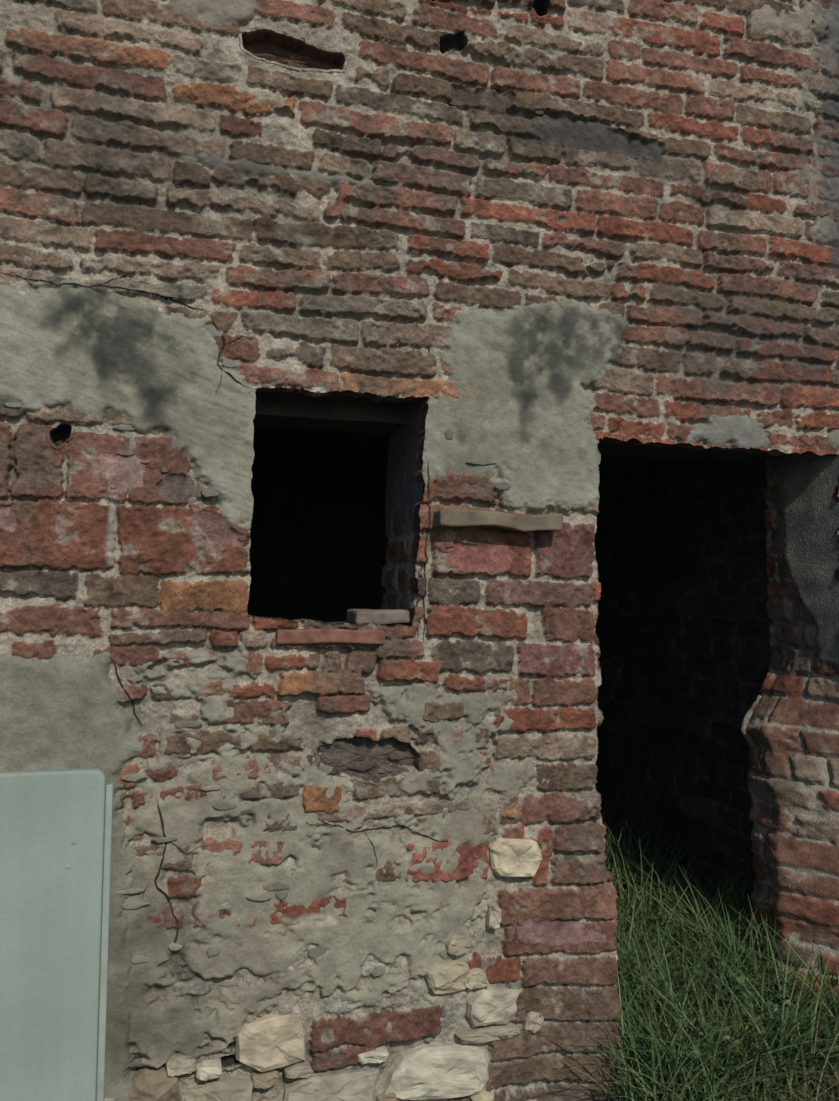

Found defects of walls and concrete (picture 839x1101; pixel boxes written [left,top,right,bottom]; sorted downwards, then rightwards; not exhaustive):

leakage [52,291,172,415]
crack [0,272,254,396]
flaking render [0,278,256,533]
leakage [509,313,601,409]
crack [141,798,200,959]
flaking render [114,636,549,1069]